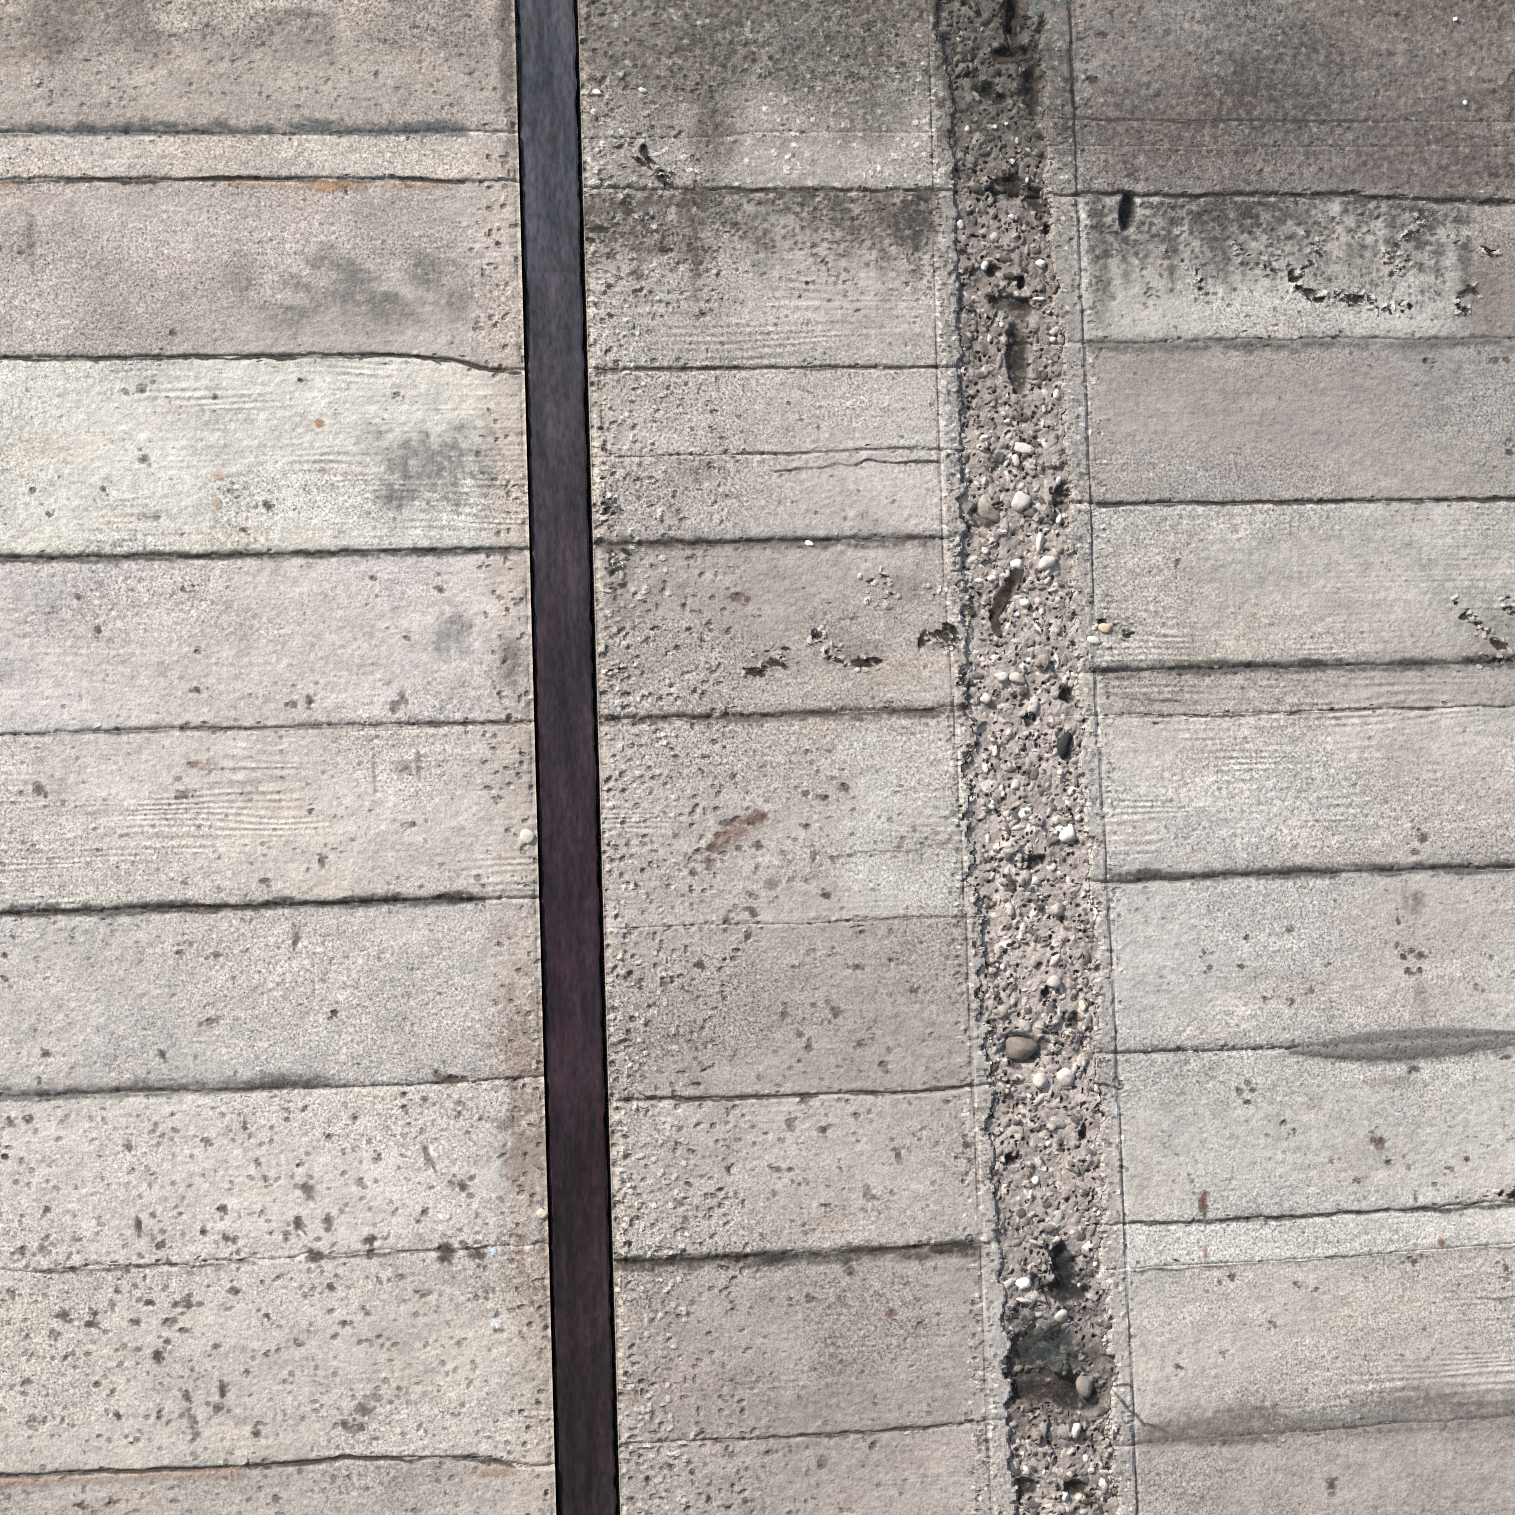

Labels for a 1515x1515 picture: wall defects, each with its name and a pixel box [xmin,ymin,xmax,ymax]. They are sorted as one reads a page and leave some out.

leakage [1074,0,1515,294]
spalling [1232,230,1413,318]
spalling [1453,284,1483,316]
spalling [744,629,884,678]
spalling [1454,602,1515,669]